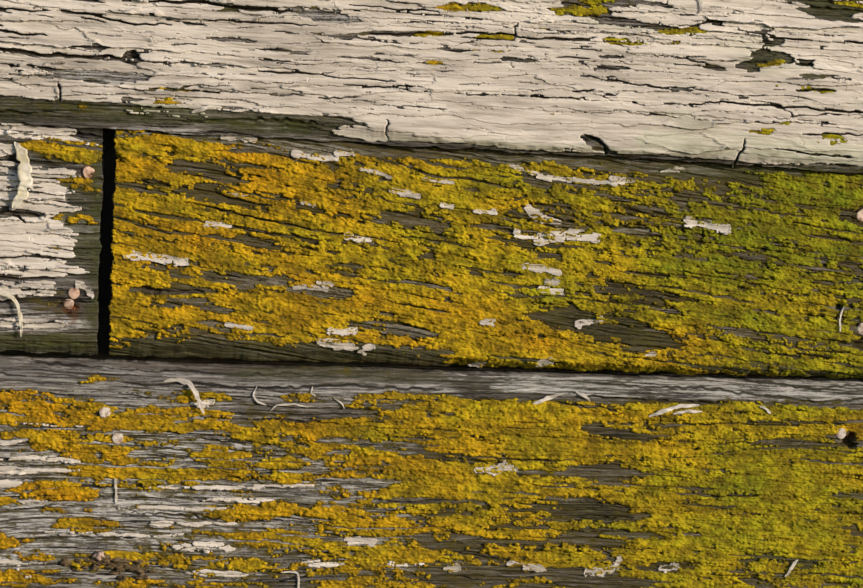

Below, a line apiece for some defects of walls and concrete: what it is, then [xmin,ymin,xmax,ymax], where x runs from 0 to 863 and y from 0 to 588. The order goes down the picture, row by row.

peeling [0,0,863,173]
crack [573,80,863,155]
peeling [0,122,99,301]
peeling [513,204,601,246]
peeling [683,216,731,235]
peeling [123,250,189,266]
peeling [521,263,564,295]
peeling [316,327,376,356]
peeling [0,440,81,488]
peeling [44,483,323,554]
peeling [184,569,249,578]
peeling [301,560,345,568]